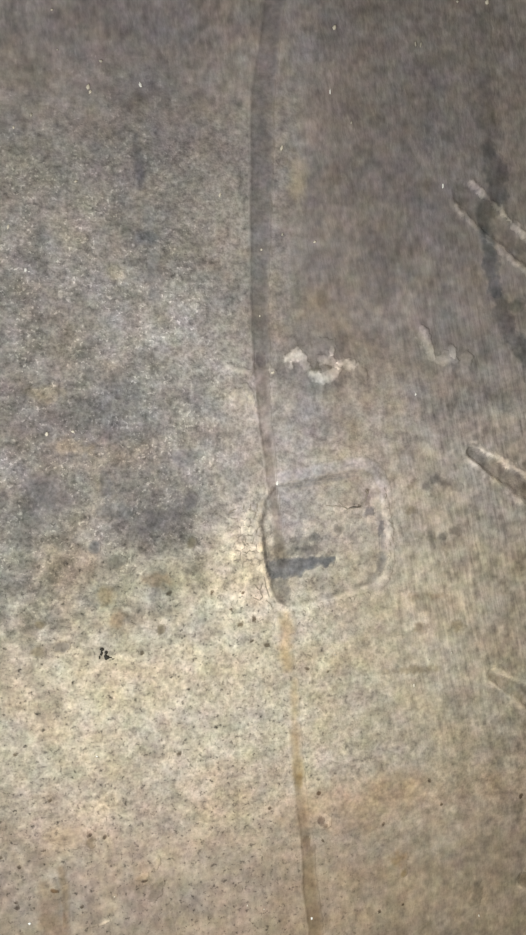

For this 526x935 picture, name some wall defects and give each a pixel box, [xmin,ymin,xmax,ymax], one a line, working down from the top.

damp [470,5,512,217]
damp [476,228,526,387]
damp [261,531,336,606]
damp [333,493,385,537]